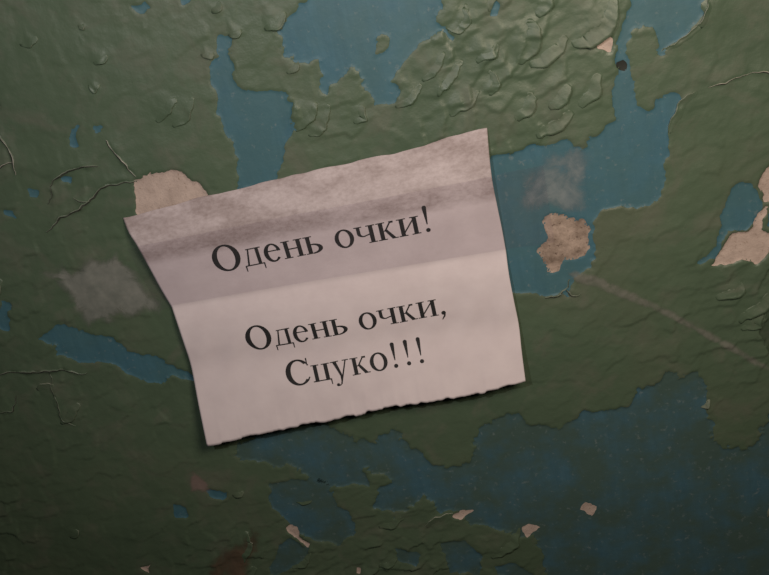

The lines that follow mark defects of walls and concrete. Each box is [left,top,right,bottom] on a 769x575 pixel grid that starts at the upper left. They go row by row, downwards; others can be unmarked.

peeling [264,0,471,108]
crack [0,136,17,175]
crack [46,140,137,232]
flaking render [134,170,208,215]
peeling [201,29,296,189]
peeling [490,0,712,297]
peeling [697,167,769,266]
leakage [54,260,156,322]
peeling [39,324,194,384]
peeling [234,371,769,575]